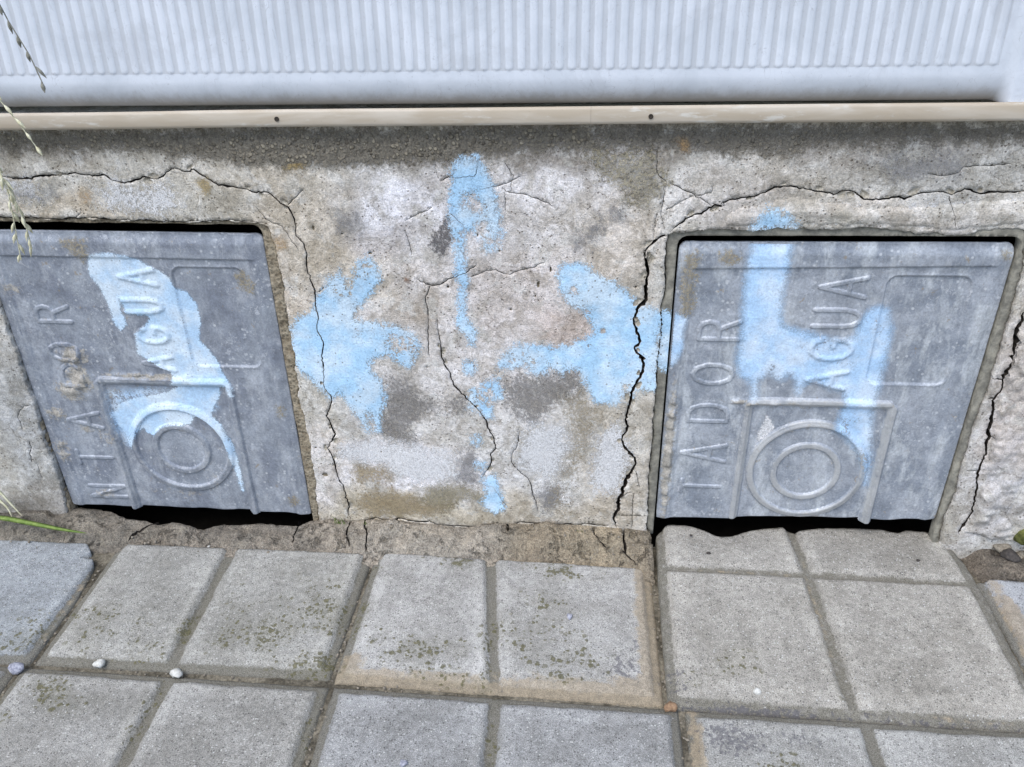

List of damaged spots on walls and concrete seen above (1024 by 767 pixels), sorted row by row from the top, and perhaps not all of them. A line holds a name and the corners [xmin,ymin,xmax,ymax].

crack [0,164,470,550]
crack [417,262,544,531]
crack [435,163,547,209]
crack [565,150,1024,564]